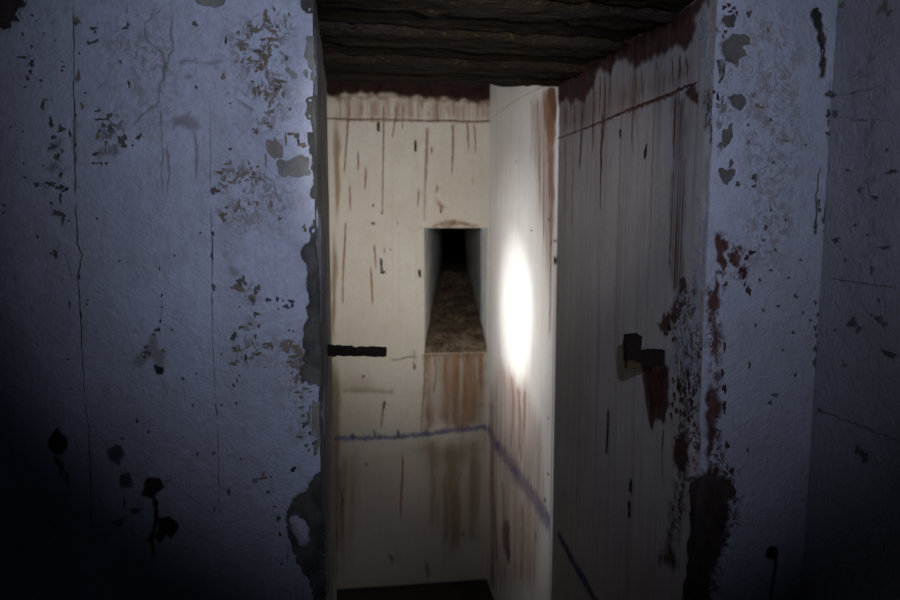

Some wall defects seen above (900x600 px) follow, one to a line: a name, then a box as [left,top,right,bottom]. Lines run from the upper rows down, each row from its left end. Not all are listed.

spalling [210,6,318,199]
corrosion [327,82,490,214]
corrosion [530,0,708,270]
spalling [698,3,766,149]
spalling [715,159,758,189]
spalling [806,2,831,83]
crack [58,10,92,529]
spalling [230,211,325,455]
corrosion [329,223,346,320]
corrosion [413,353,483,429]
corrosion [642,86,752,569]
spalling [273,471,326,600]